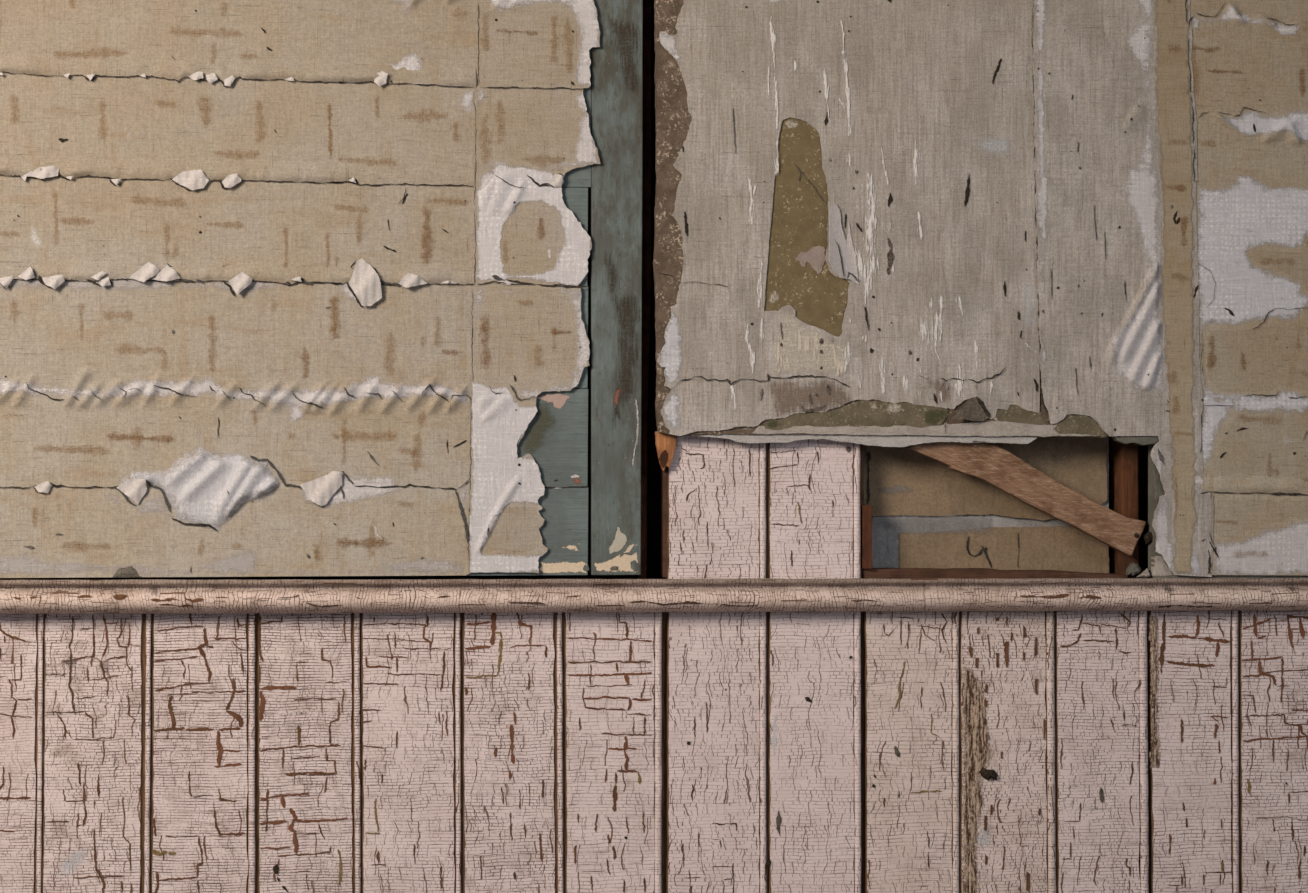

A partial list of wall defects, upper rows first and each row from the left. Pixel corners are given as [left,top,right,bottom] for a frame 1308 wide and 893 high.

spalling [653,0,1159,447]
peeling [537,393,570,409]
crack [0,595,757,893]
crack [852,599,948,751]
crack [883,790,942,807]